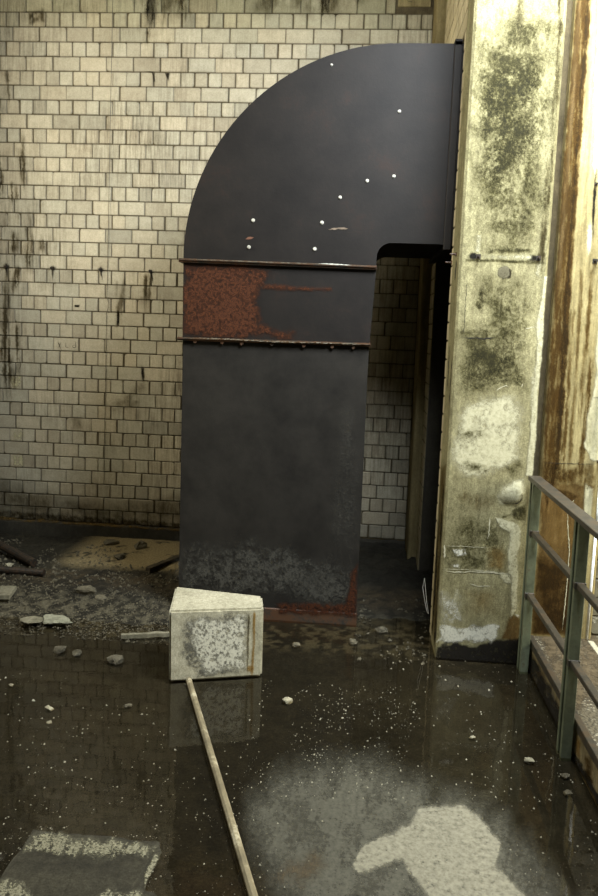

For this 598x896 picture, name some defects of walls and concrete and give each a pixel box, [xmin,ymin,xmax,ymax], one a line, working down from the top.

corrosion [183,264,332,339]
water stain [461,0,563,476]
corrosion [532,0,594,635]